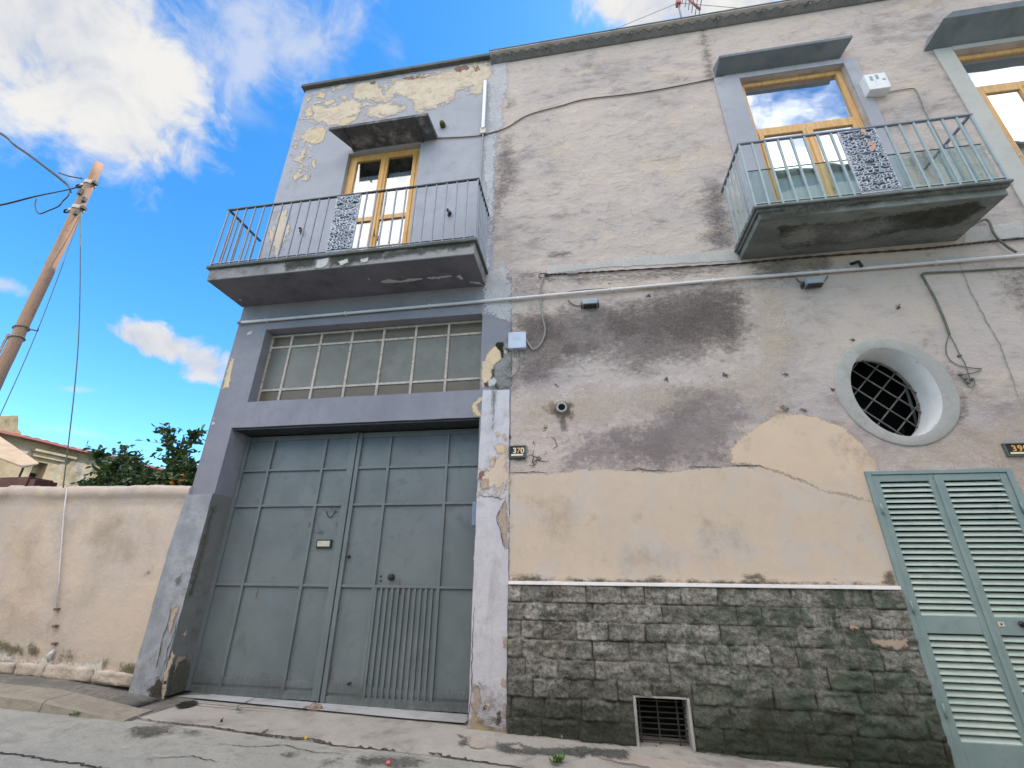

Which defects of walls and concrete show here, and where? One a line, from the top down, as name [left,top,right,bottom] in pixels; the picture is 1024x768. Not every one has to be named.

peeling [286,61,508,270]
damp [512,281,749,388]
spalling [471,342,513,418]
peeling [476,432,511,548]
spalling [147,649,186,699]
spalling [870,635,909,650]
spalling [458,686,724,768]